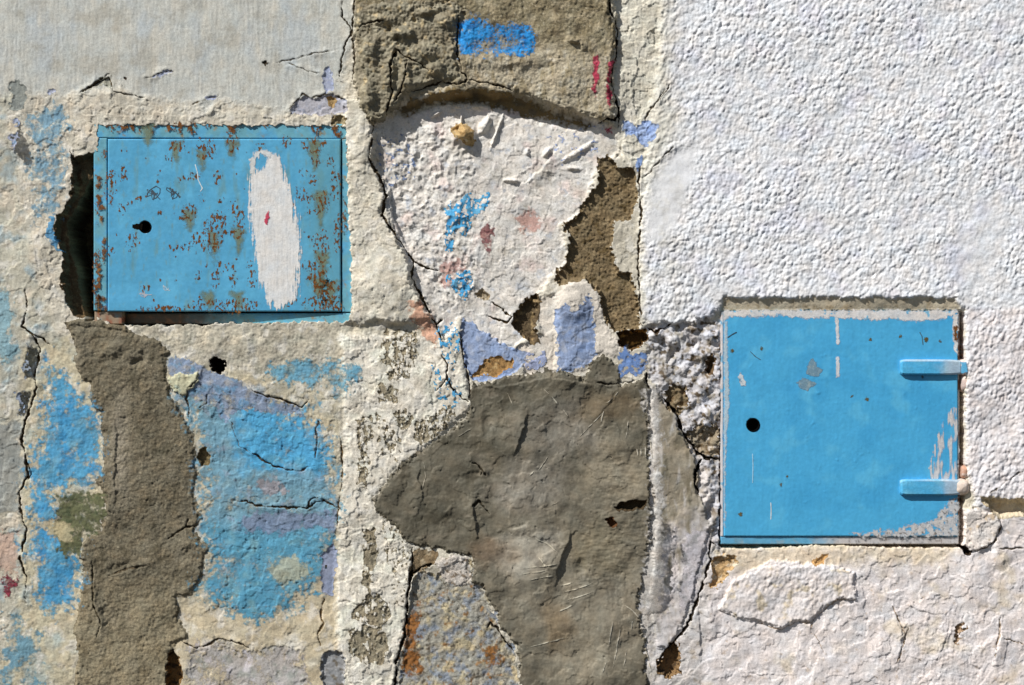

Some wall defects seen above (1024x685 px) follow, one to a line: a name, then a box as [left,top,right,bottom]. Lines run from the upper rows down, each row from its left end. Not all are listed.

crack [368,15,518,402]
peeling [548,120,659,351]
crack [18,289,49,599]
spalling [196,447,211,466]
crack [232,390,343,524]
peeling [355,293,542,490]
crack [597,373,718,495]
crack [658,541,714,663]
crack [758,599,853,652]